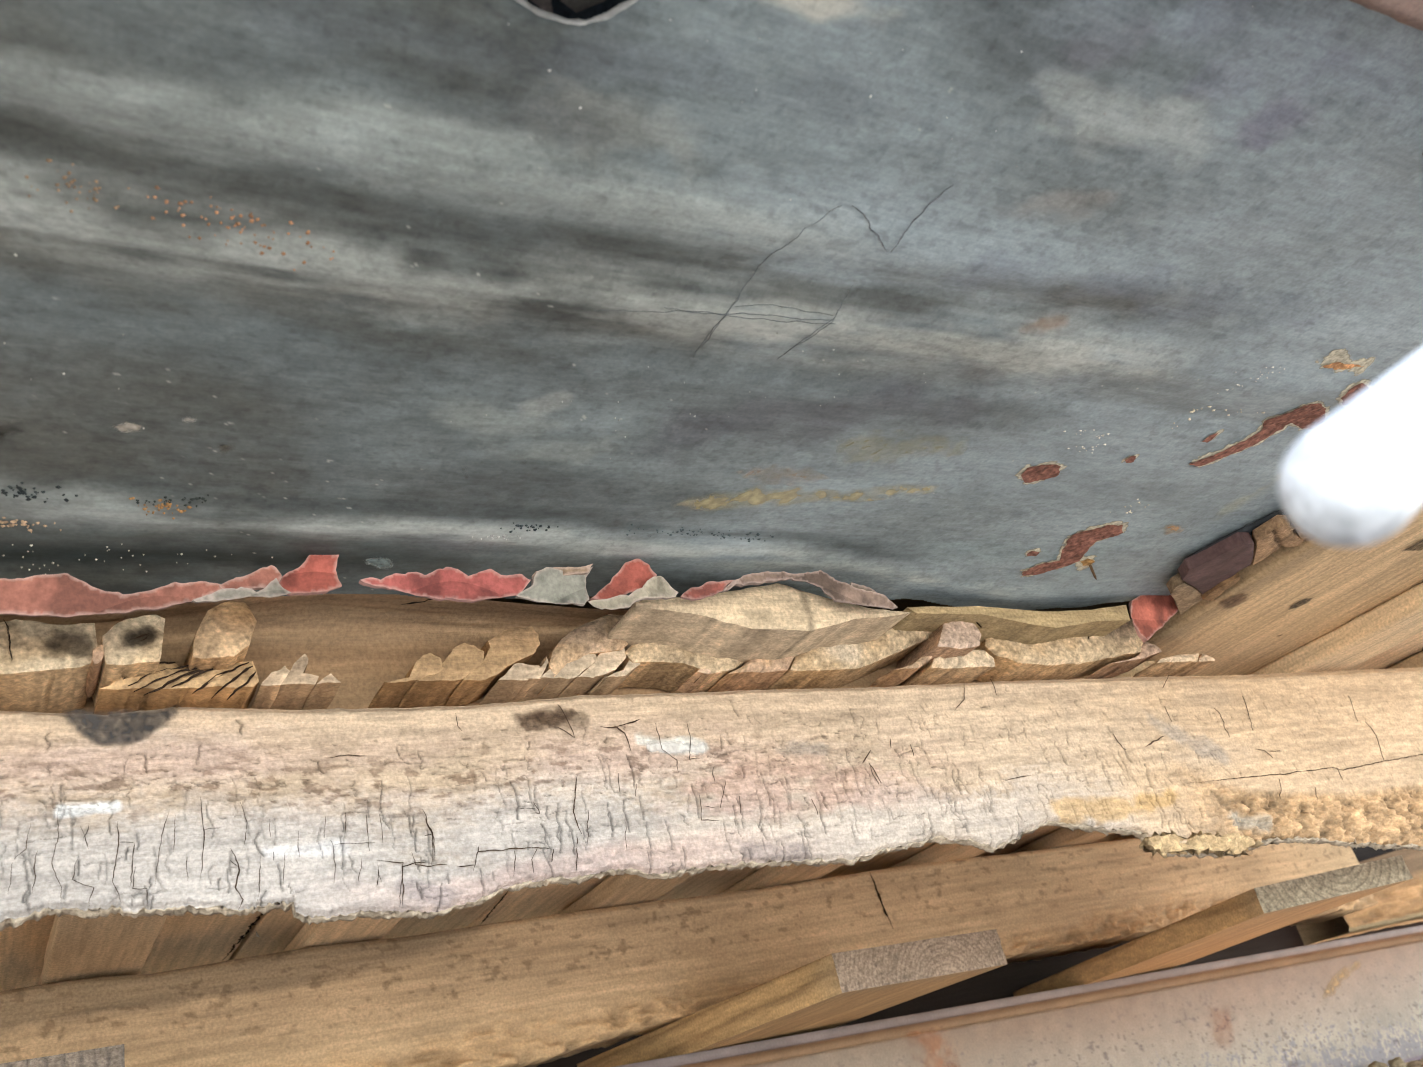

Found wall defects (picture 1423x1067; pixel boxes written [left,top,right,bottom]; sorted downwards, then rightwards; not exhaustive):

peeling [589,559,657,601]
peeling [680,580,733,601]
crack [558,705,741,821]
crack [863,739,914,784]
crack [1113,675,1172,750]
crack [1193,695,1423,798]
crack [8,778,589,960]
crack [870,874,893,928]